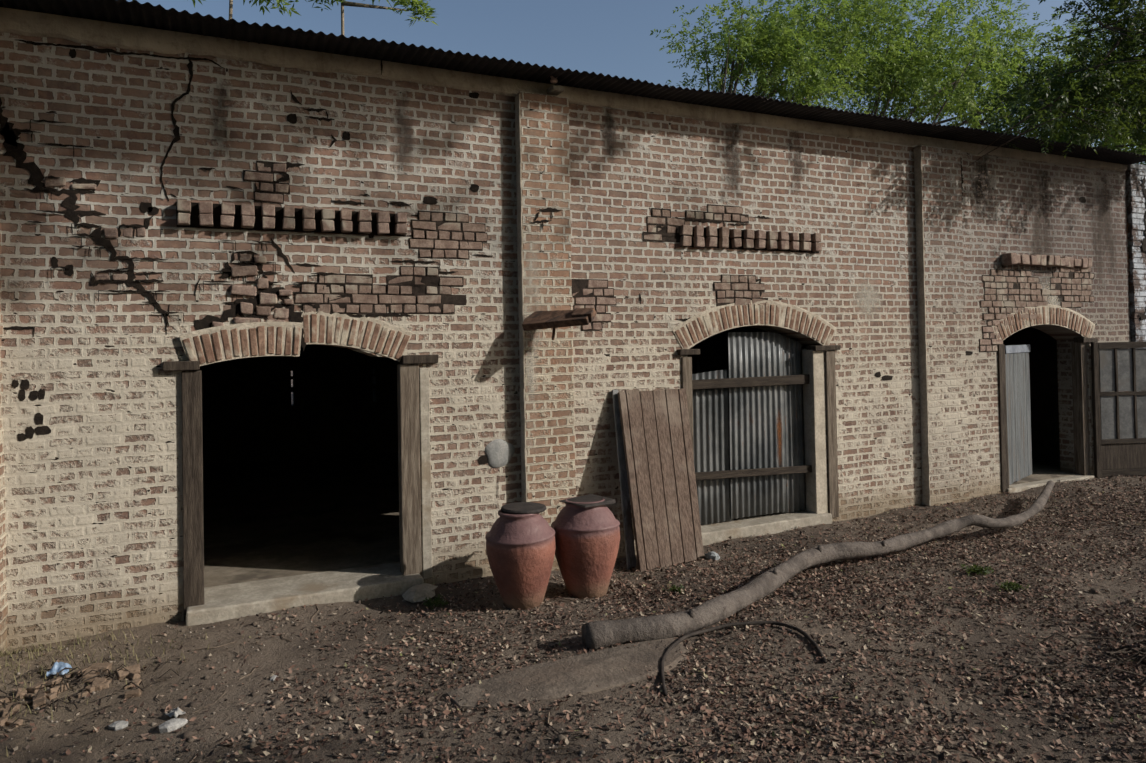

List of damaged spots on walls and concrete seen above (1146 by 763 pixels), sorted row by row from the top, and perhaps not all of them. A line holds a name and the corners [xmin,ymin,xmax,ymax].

crack [0,39,493,351]